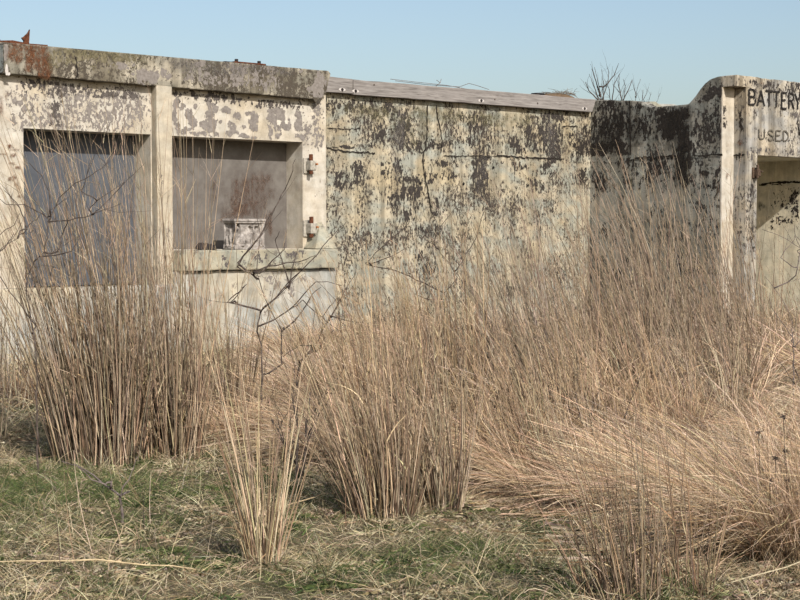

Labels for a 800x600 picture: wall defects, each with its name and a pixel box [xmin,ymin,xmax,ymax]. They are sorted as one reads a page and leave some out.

rust [9,44,51,79]
peeling [4,44,172,133]
peeling [749,79,800,130]
peeling [172,60,490,276]
crack [418,105,564,218]
peeling [768,188,799,230]